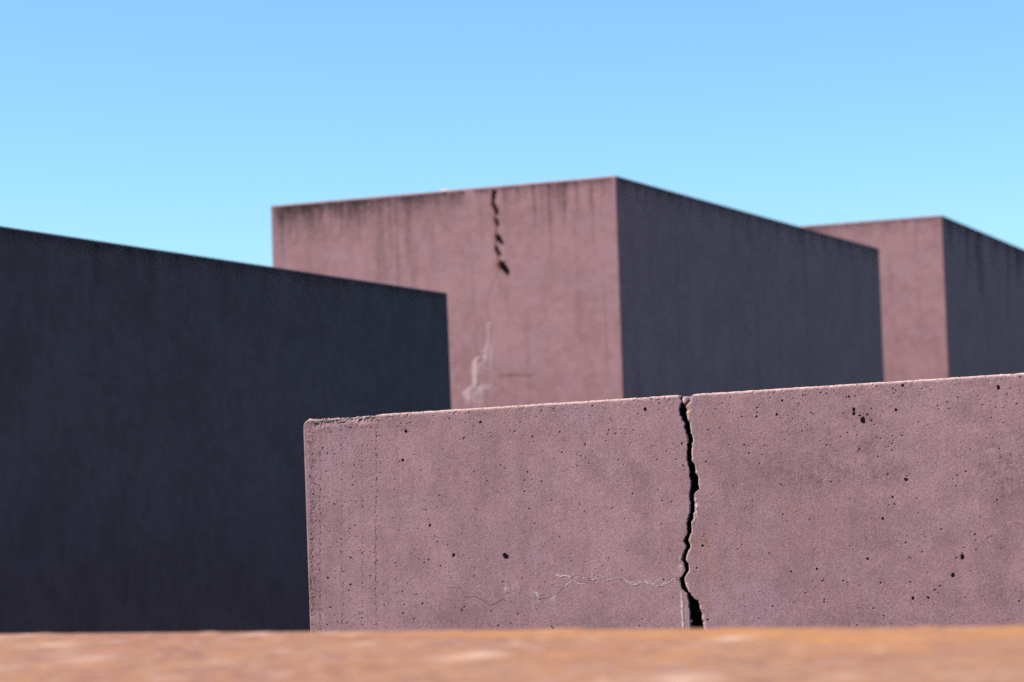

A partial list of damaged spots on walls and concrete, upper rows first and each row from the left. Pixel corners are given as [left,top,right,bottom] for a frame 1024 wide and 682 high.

crack [490,188,510,277]
leakage [463,350,487,400]
crack [556,395,708,629]